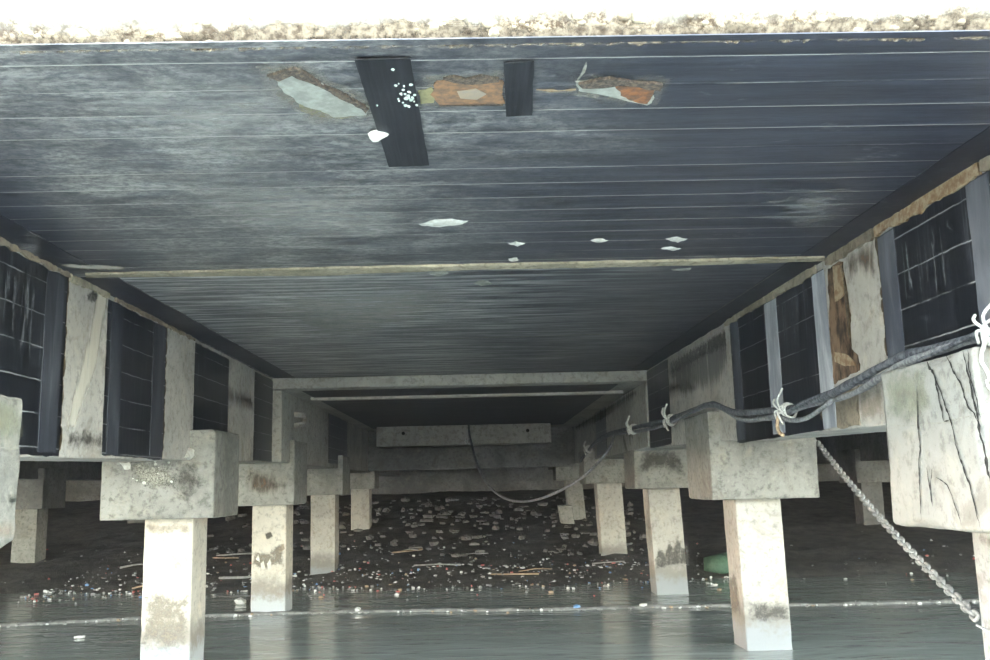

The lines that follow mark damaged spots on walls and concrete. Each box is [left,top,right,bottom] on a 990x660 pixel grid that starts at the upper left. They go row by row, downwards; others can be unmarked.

spalling [257,66,371,120]
spalling [418,73,505,107]
spalling [574,76,666,105]
crack [889,353,990,525]
water stain [641,451,682,470]
water stain [145,596,186,646]
water stain [755,604,787,621]